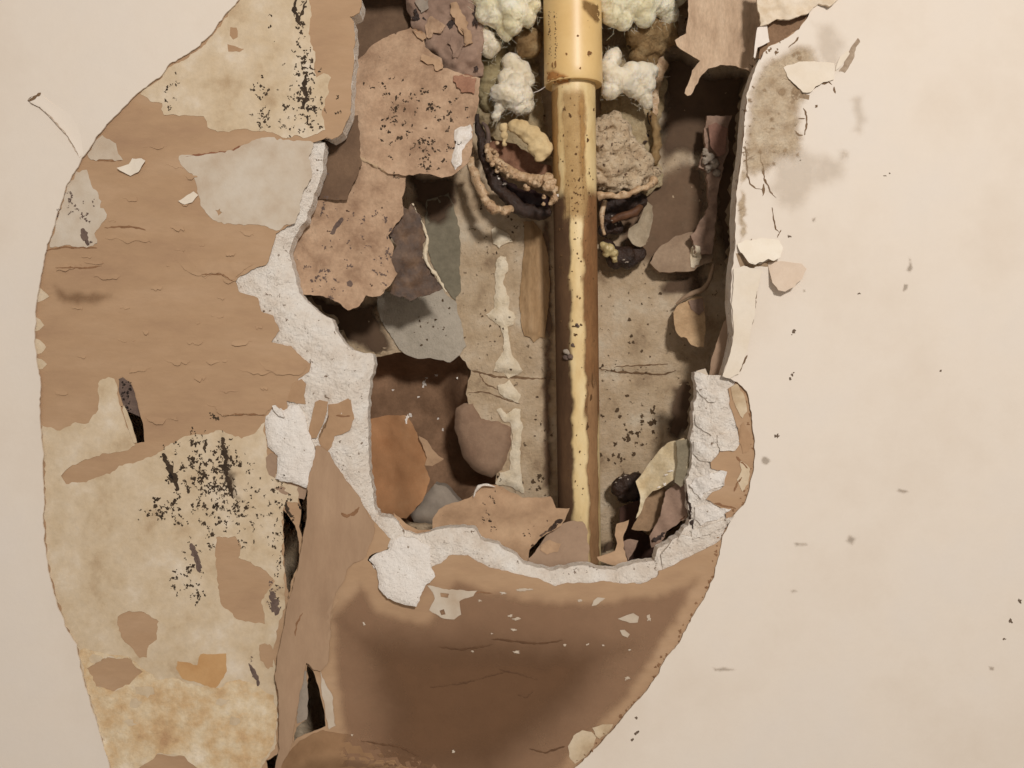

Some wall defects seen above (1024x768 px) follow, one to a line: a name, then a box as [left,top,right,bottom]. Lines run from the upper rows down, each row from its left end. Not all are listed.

peeling [28,0,365,484]
damp [249,0,341,137]
damp [621,42,814,260]
peeling [215,0,837,768]
peeling [43,460,62,613]
damp [138,412,306,616]
peeling [77,611,159,691]
peeling [140,754,196,768]